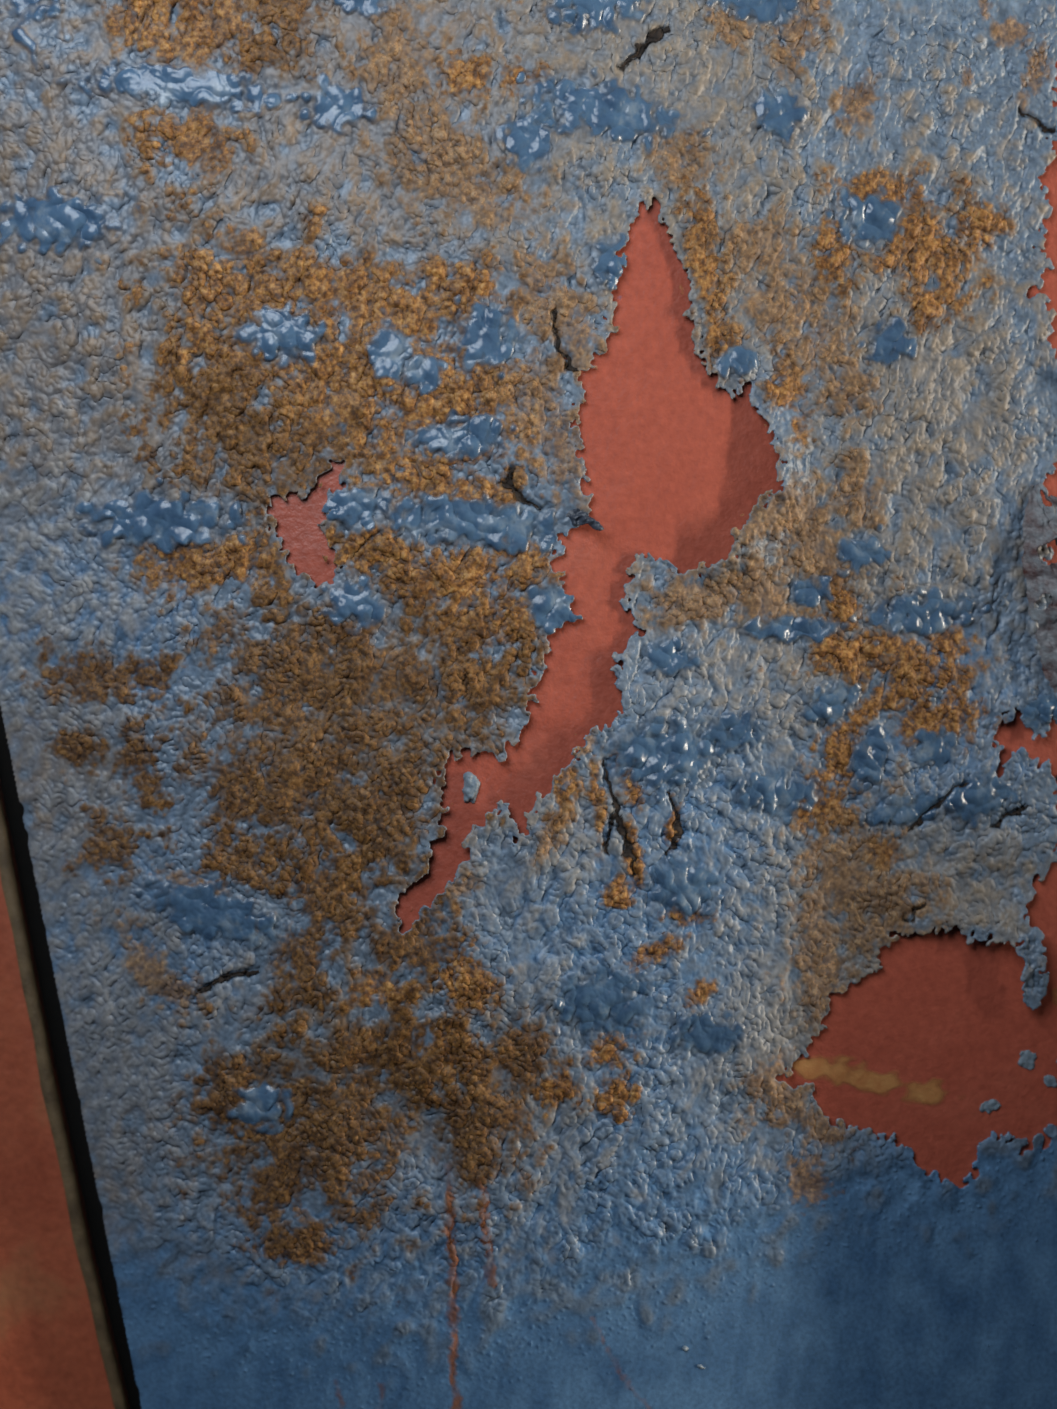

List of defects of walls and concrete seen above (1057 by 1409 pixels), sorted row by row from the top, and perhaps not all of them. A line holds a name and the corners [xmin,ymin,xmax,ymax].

rust [124,108,256,182]
rust [105,0,340,78]
rust [349,11,549,226]
rust [652,131,1015,445]
peeling [1026,138,1057,359]
peeling [266,460,346,588]
peeling [395,197,787,934]
rust [641,449,999,834]
peeling [1040,462,1057,506]
rust [21,203,645,1409]
peeling [992,707,1057,810]
peeling [775,844,1057,1188]